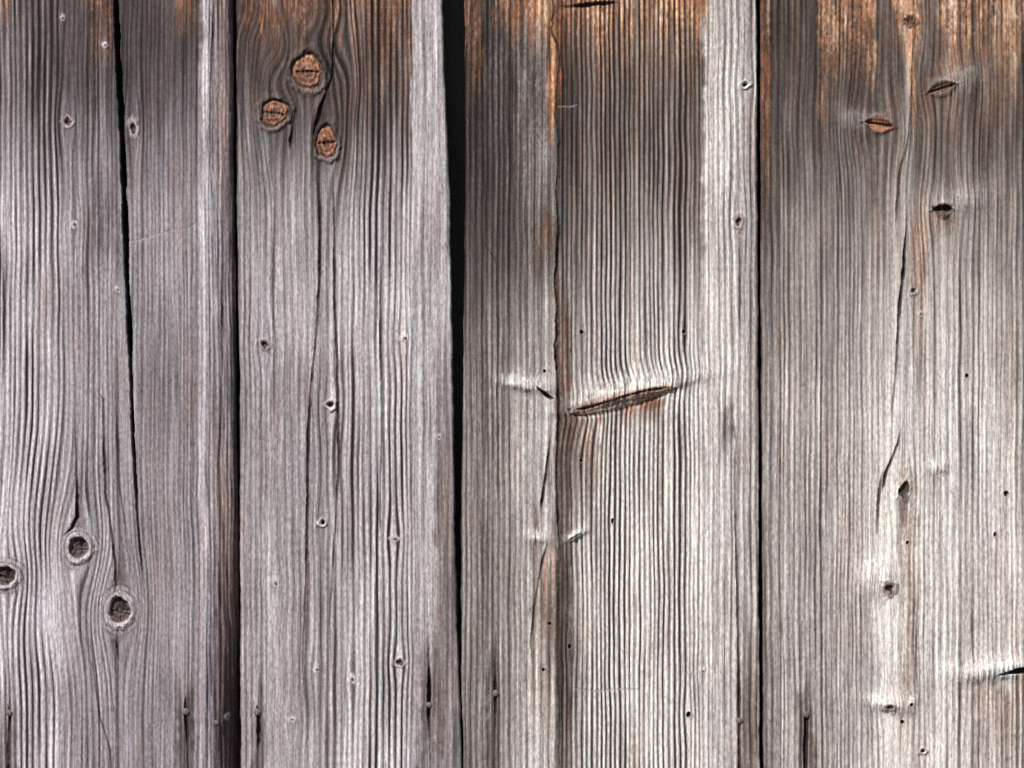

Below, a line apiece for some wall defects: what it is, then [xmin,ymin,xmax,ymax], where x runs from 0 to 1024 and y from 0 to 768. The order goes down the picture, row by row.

crack [66,0,142,591]
crack [530,0,662,646]
crack [876,435,900,527]